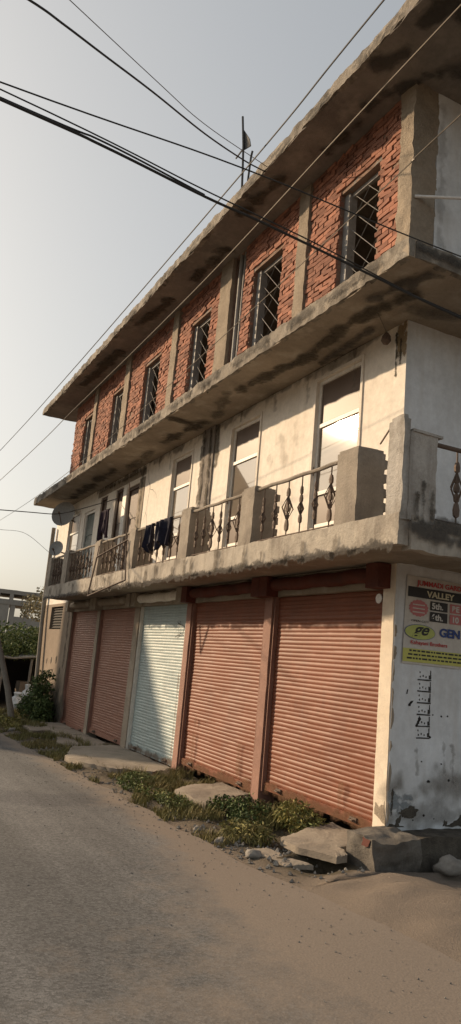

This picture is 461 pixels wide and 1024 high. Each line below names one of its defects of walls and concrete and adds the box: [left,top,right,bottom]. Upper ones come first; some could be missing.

damp [352,14,411,73]
damp [417,0,461,29]
damp [321,66,461,155]
damp [190,247,232,282]
damp [52,347,126,402]
damp [69,274,458,508]
damp [409,481,461,547]
peeling [374,625,461,827]